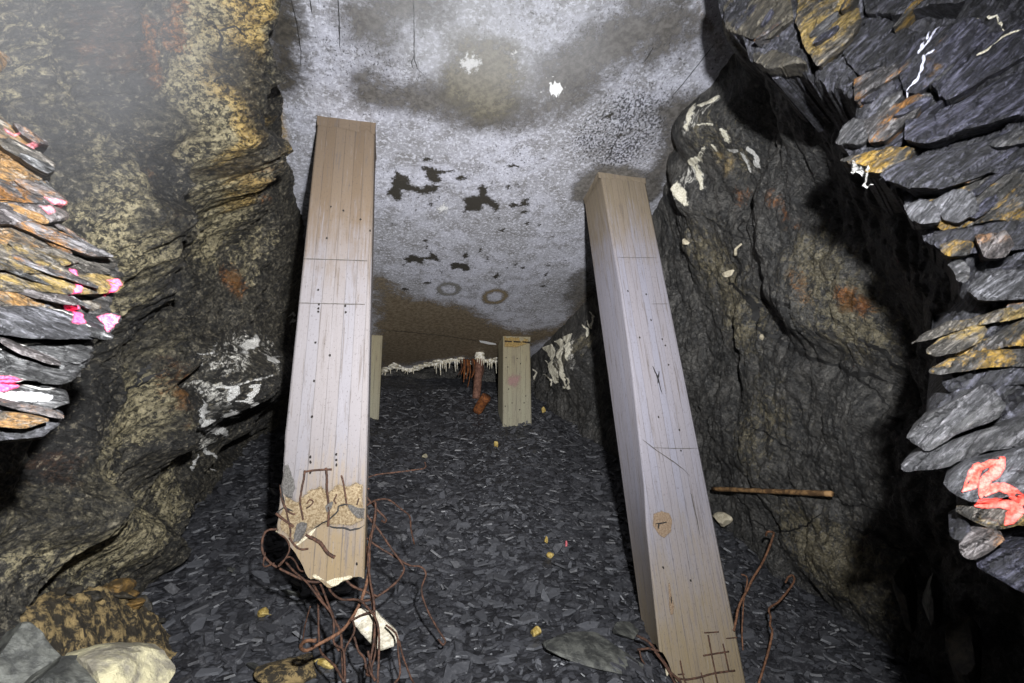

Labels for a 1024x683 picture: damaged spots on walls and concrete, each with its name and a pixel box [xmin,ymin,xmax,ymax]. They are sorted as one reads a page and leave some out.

damp [340,0,705,131]
peeling [386,157,467,207]
peeling [461,184,541,232]
peeling [403,239,489,273]
damp [372,269,597,390]
rust [458,358,484,387]
spalling [261,462,446,683]